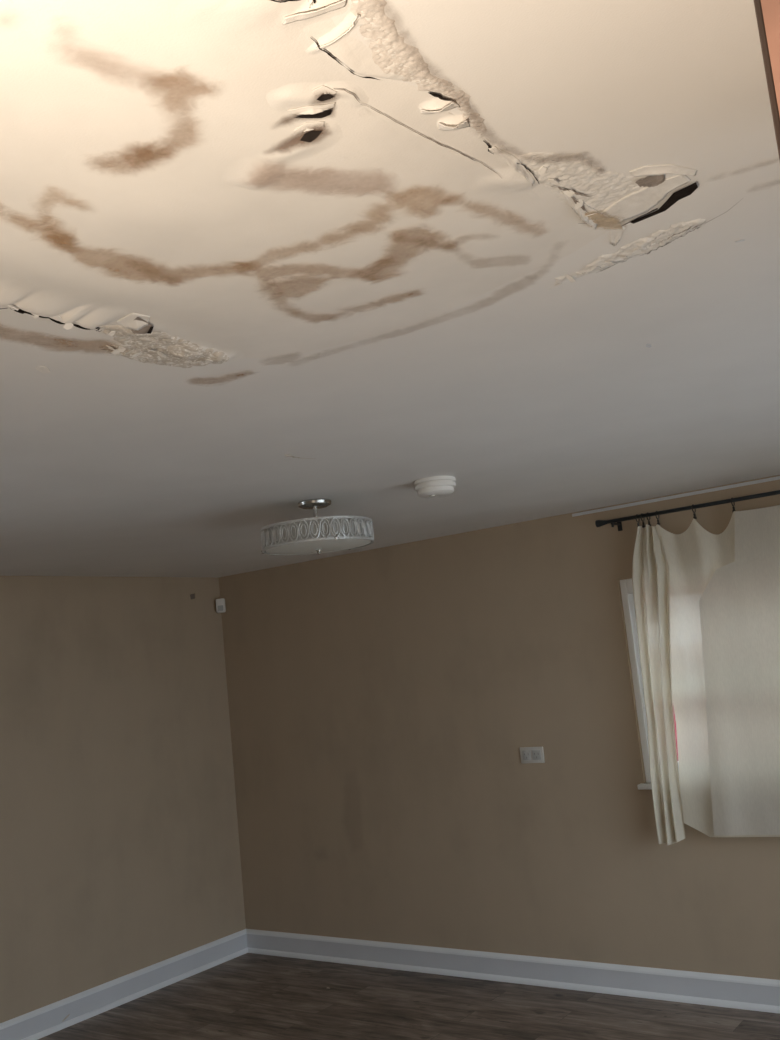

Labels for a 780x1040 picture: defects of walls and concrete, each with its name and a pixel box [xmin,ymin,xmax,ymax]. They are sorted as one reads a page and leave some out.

water stain [275,127,326,151]
peeling [98,325,230,368]